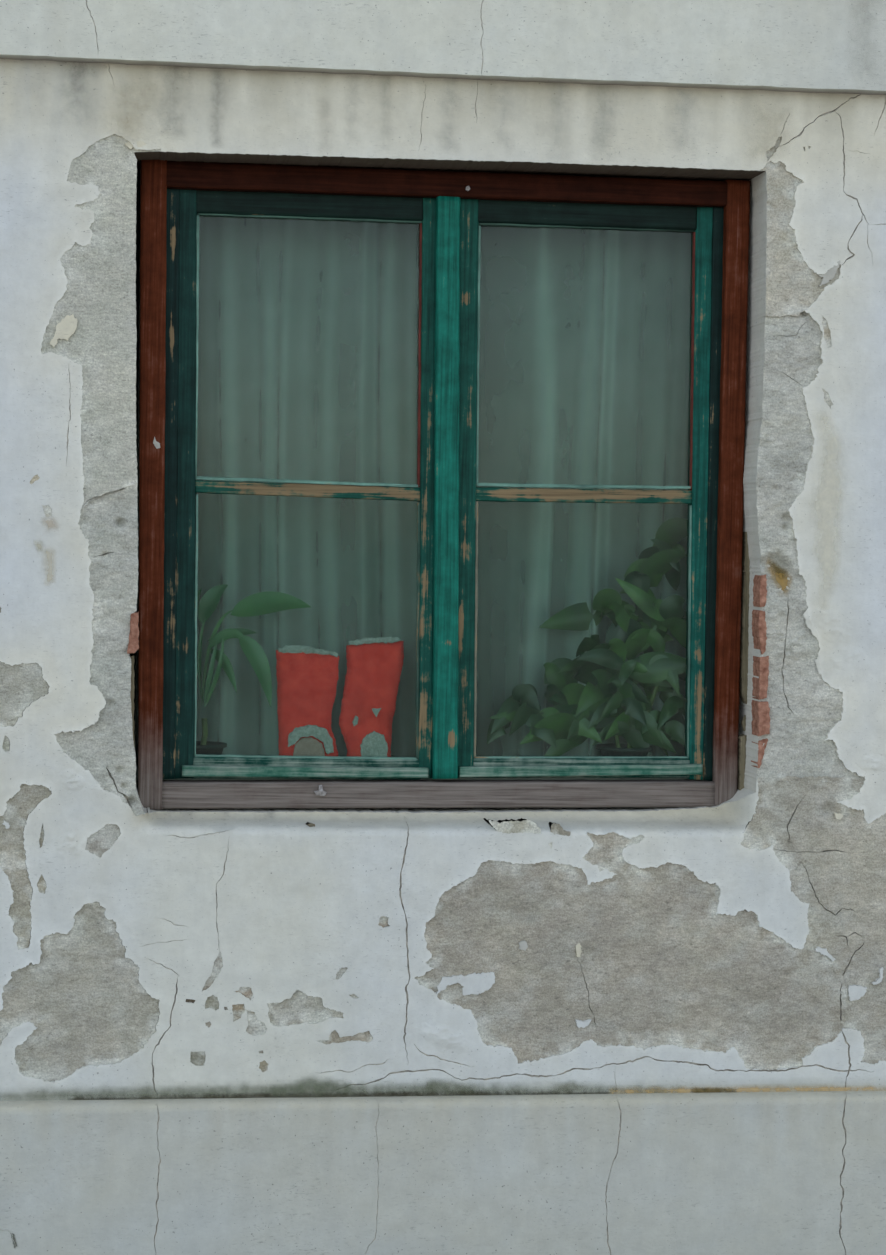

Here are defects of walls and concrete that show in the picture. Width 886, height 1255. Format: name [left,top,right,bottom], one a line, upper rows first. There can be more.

crack [780,94,886,265]
flaking render [0,661,49,751]
flaking render [41,134,161,816]
flaking render [415,137,886,1070]
flaking render [0,784,160,1081]
crack [144,918,186,1255]
flaking render [190,1051,205,1066]
crack [169,830,230,951]
flaking render [186,952,372,1044]
crack [323,795,869,1255]